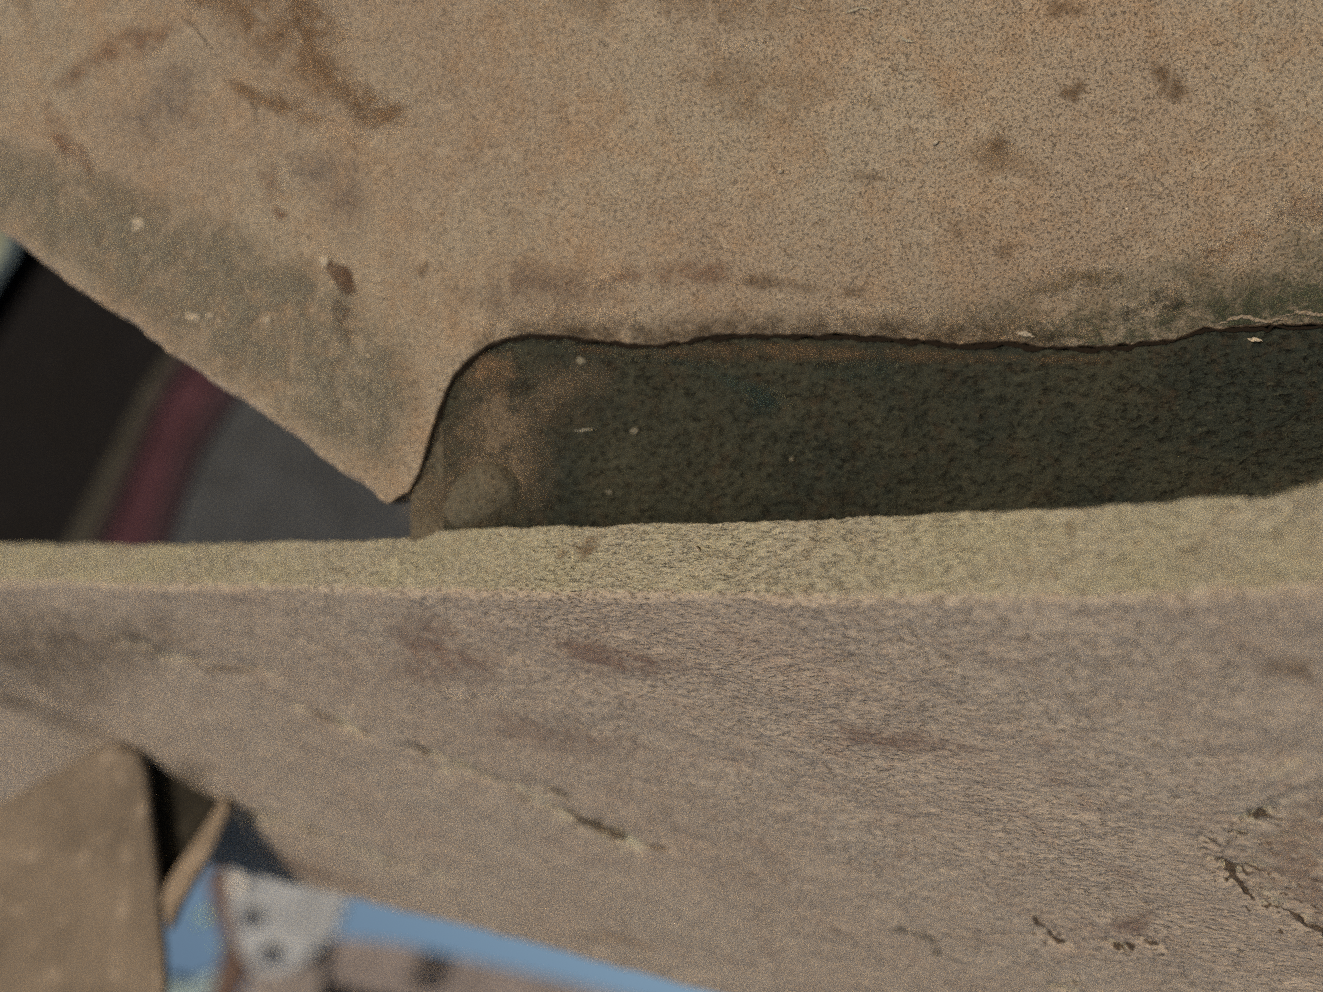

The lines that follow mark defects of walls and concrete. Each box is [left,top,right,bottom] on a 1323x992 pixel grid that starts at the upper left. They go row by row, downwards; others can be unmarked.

crack [1201,807,1323,946]
crack [1032,912,1078,987]
crack [1113,934,1159,956]